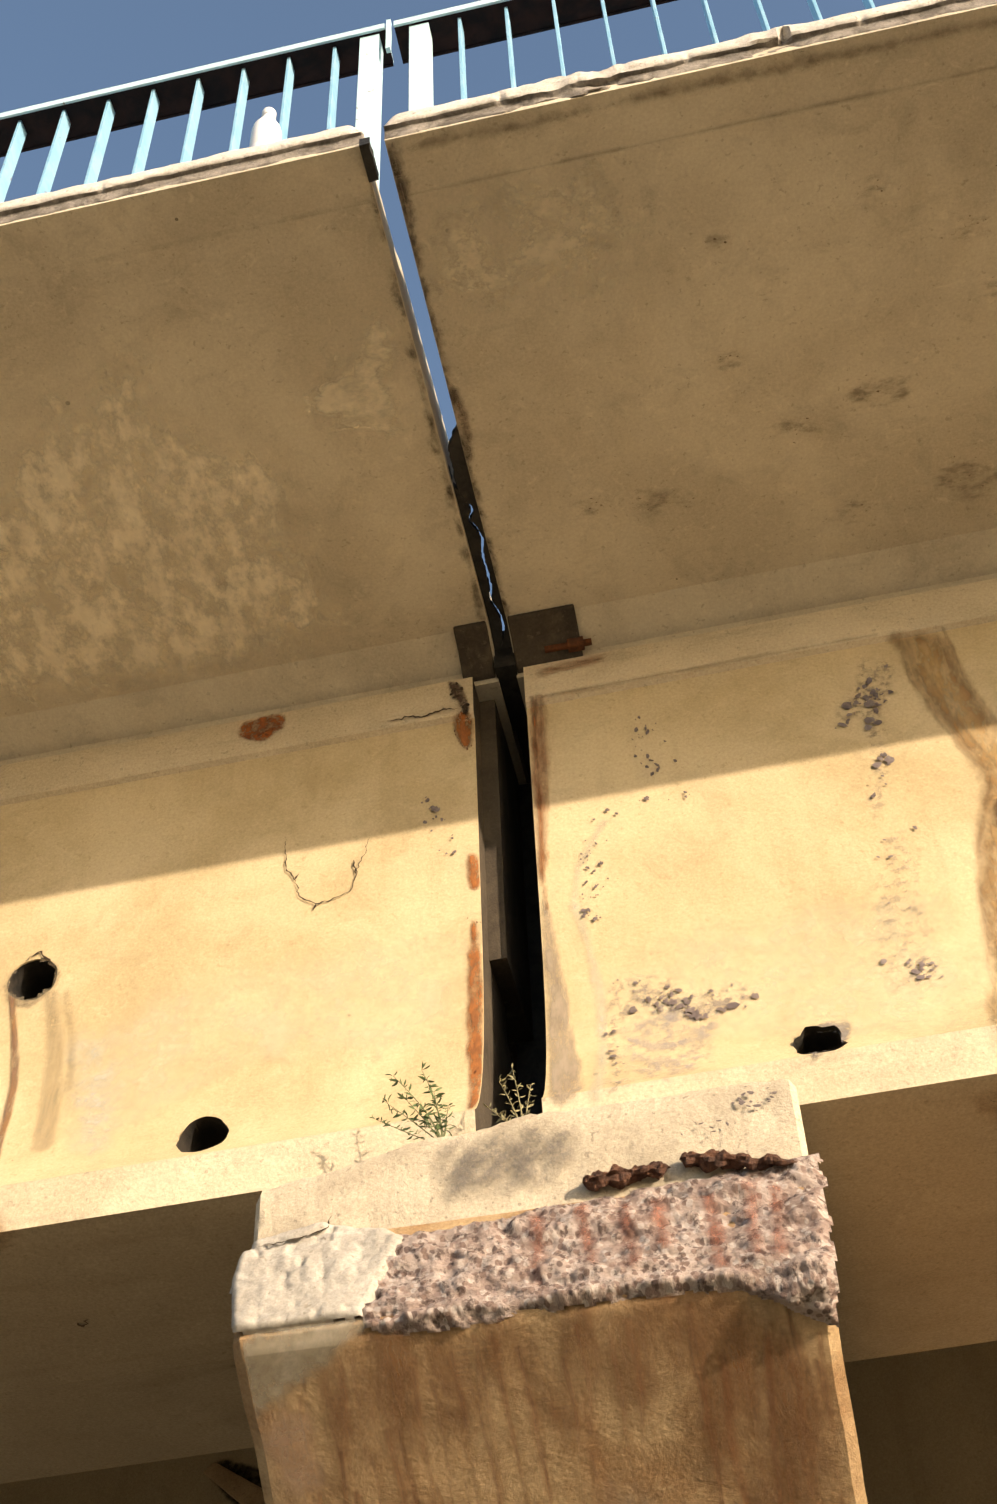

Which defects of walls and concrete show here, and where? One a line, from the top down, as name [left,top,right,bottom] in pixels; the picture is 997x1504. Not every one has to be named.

corrosion [240,714,285,741]
crack [391,708,457,721]
corrosion [454,711,472,750]
water stain [895,636,997,949]
crack [284,837,368,910]
corrosion [468,855,480,889]
corrosion [467,917,483,1108]
spalling [360,1153,840,1336]